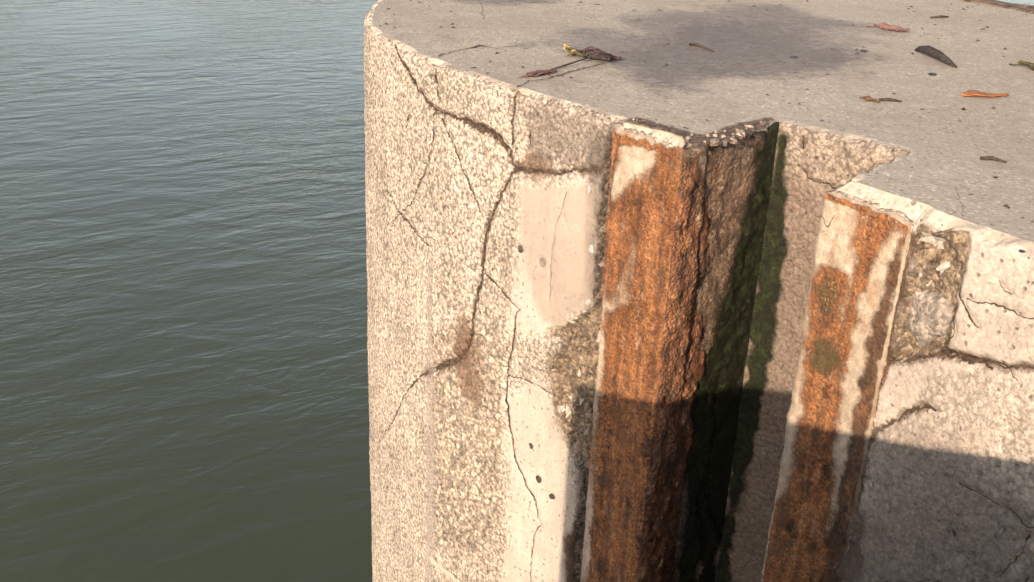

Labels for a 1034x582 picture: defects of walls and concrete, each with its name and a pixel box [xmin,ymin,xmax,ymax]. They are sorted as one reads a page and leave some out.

crack [383,35,610,582]
spalling [549,134,613,582]
corrosion [563,131,764,582]
peeling [620,117,773,582]
corrosion [762,193,917,582]
crack [867,404,936,448]
spalling [892,224,969,363]
crack [887,269,1034,381]
crack [959,483,1034,582]